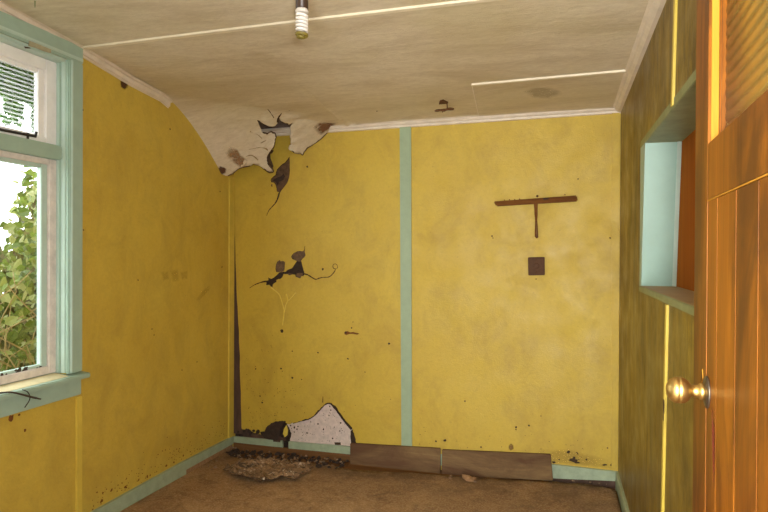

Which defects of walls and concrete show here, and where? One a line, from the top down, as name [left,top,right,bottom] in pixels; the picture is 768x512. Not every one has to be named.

spalling [258,119,292,129]
flaking render [235,399,356,447]